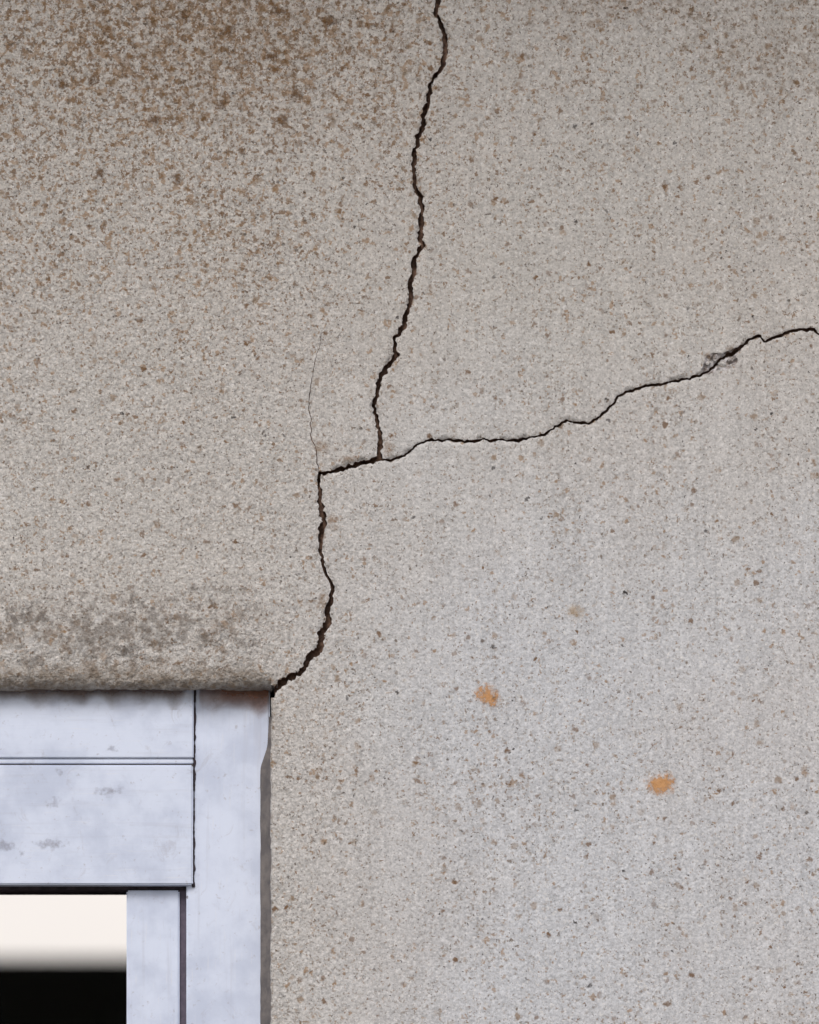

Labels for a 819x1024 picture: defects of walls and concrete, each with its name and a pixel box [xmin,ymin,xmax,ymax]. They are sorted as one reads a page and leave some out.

crack [274,0,819,694]
rust [474,683,498,706]
rust [647,774,674,795]